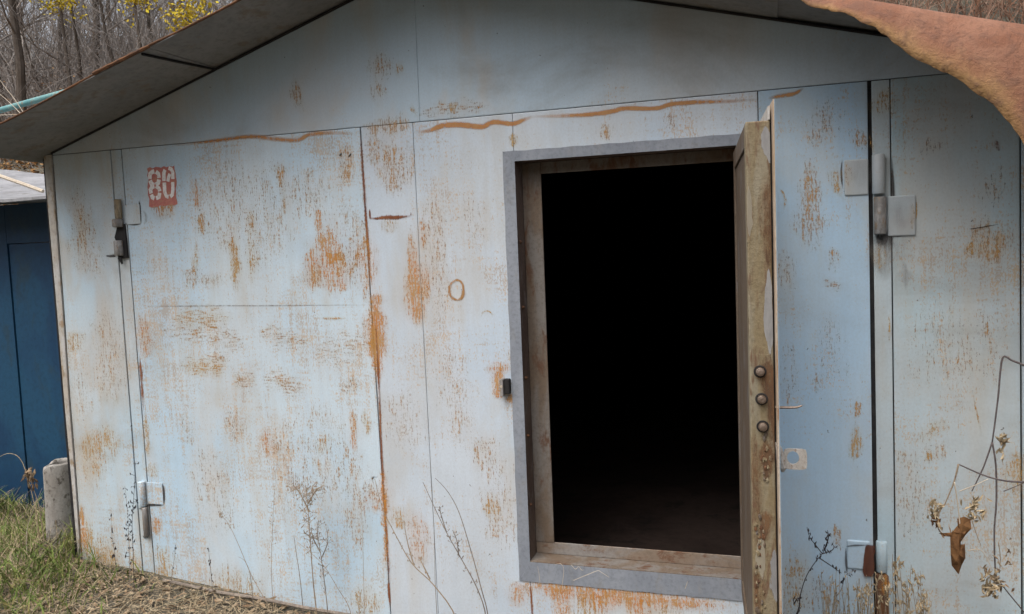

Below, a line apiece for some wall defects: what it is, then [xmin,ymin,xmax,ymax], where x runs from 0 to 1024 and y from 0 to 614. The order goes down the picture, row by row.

corrosion [428,101,525,146]
corrosion [563,100,721,140]
corrosion [403,202,464,322]
corrosion [760,185,794,282]
corrosion [793,158,830,242]
corrosion [164,306,243,376]
corrosion [182,109,431,614]
corrosion [489,352,512,404]
corrosion [760,347,798,438]
corrosion [473,438,516,550]
corrosion [79,507,139,570]
corrosion [509,582,714,614]